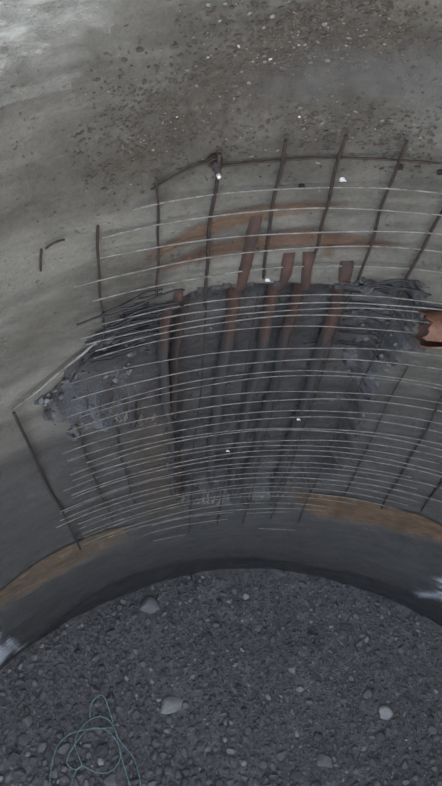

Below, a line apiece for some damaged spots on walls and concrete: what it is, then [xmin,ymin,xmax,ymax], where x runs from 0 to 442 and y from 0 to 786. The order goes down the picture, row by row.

spalling [34,277,431,505]
rust [151,204,390,506]